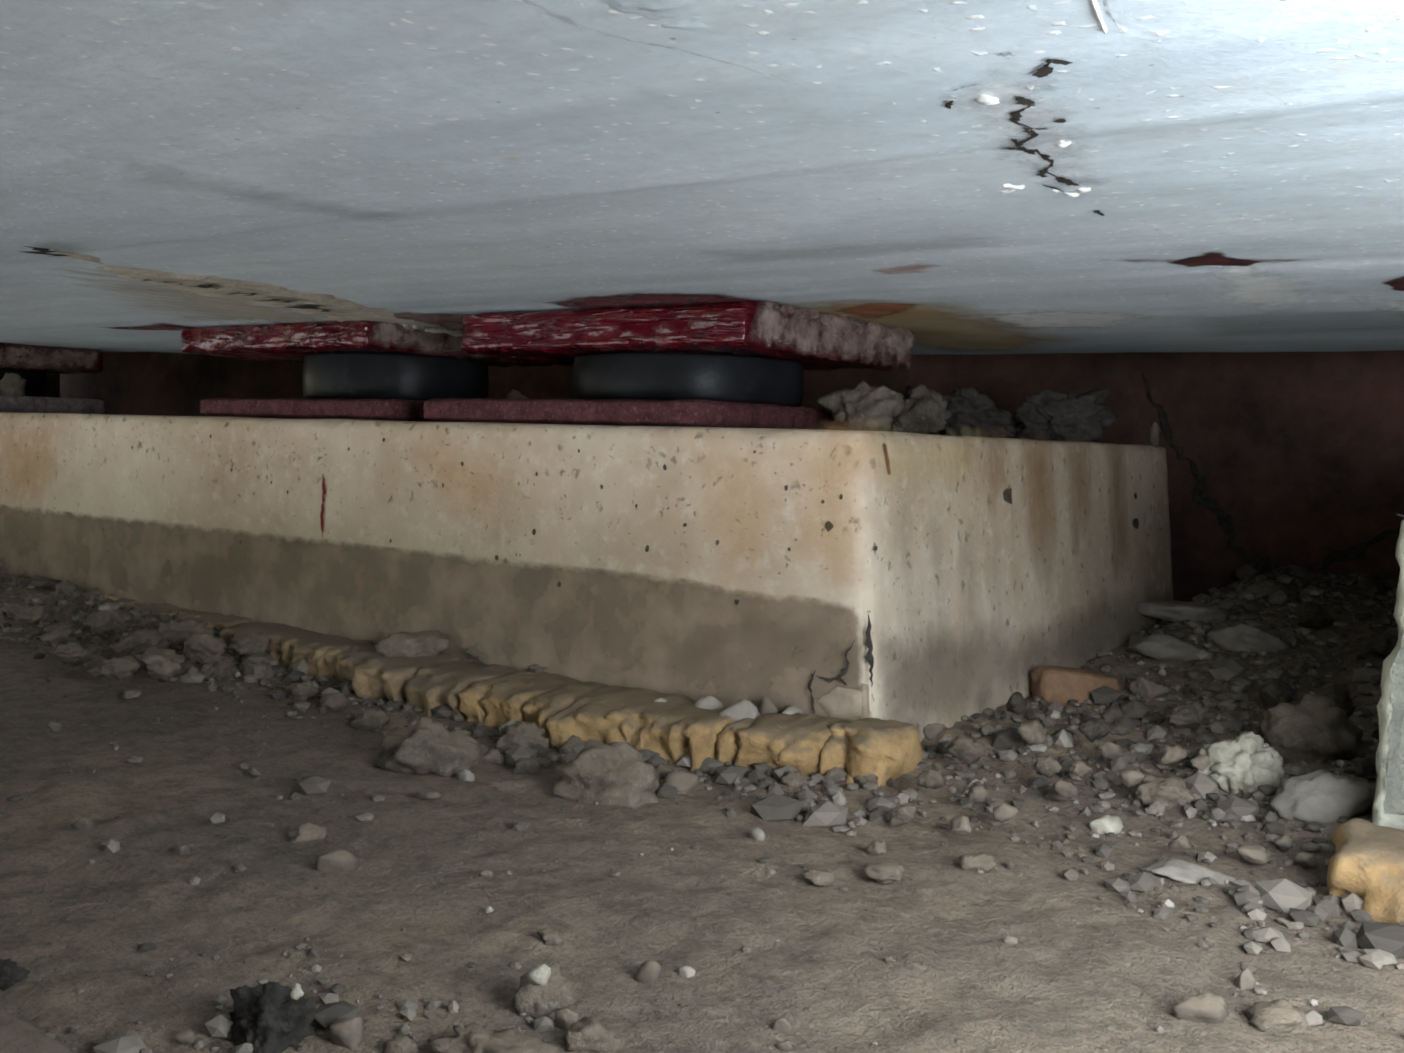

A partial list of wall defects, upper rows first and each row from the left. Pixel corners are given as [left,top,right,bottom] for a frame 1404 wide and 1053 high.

crack [944,52,1105,216]
peeling [17,246,441,327]
rust [1170,252,1290,267]
rust [1384,277,1404,291]
damp [0,475,861,721]
crack [808,614,874,719]
spalling [1384,633,1404,815]